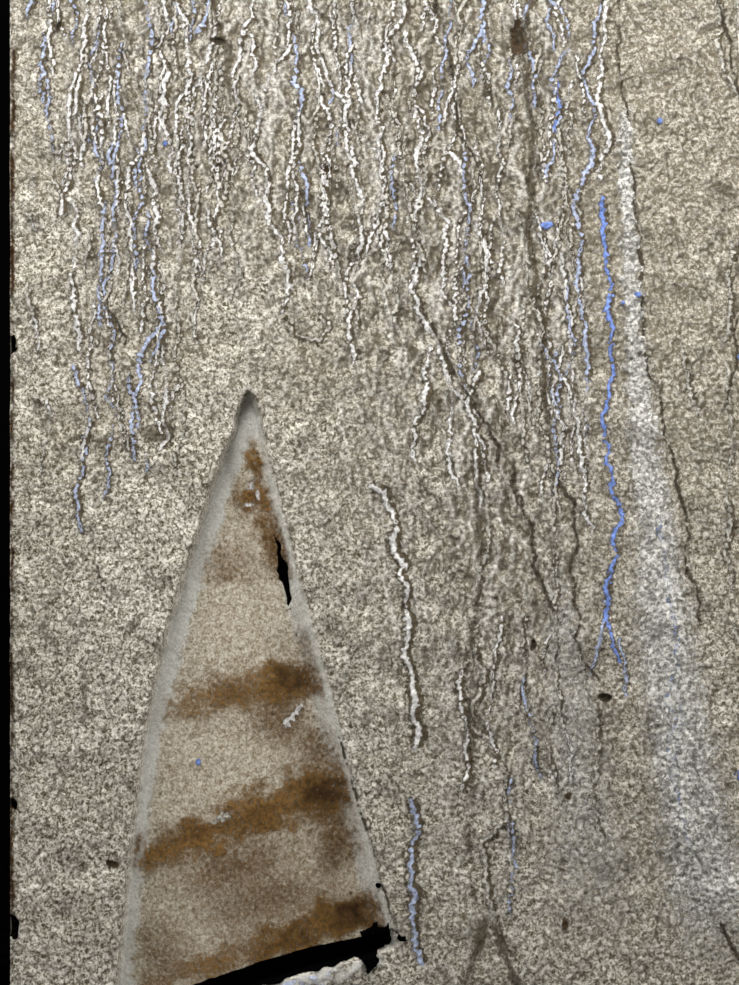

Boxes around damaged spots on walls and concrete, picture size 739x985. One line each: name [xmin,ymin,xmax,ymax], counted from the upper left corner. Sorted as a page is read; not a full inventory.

water stain [25,0,38,16]
crack [716,0,739,95]
water stain [25,284,42,375]
water stain [49,0,413,532]
crack [726,319,739,400]
corrosion [233,441,292,580]
crack [274,535,292,610]
water stain [369,480,429,750]
water stain [383,0,739,985]
corrosion [133,632,385,985]